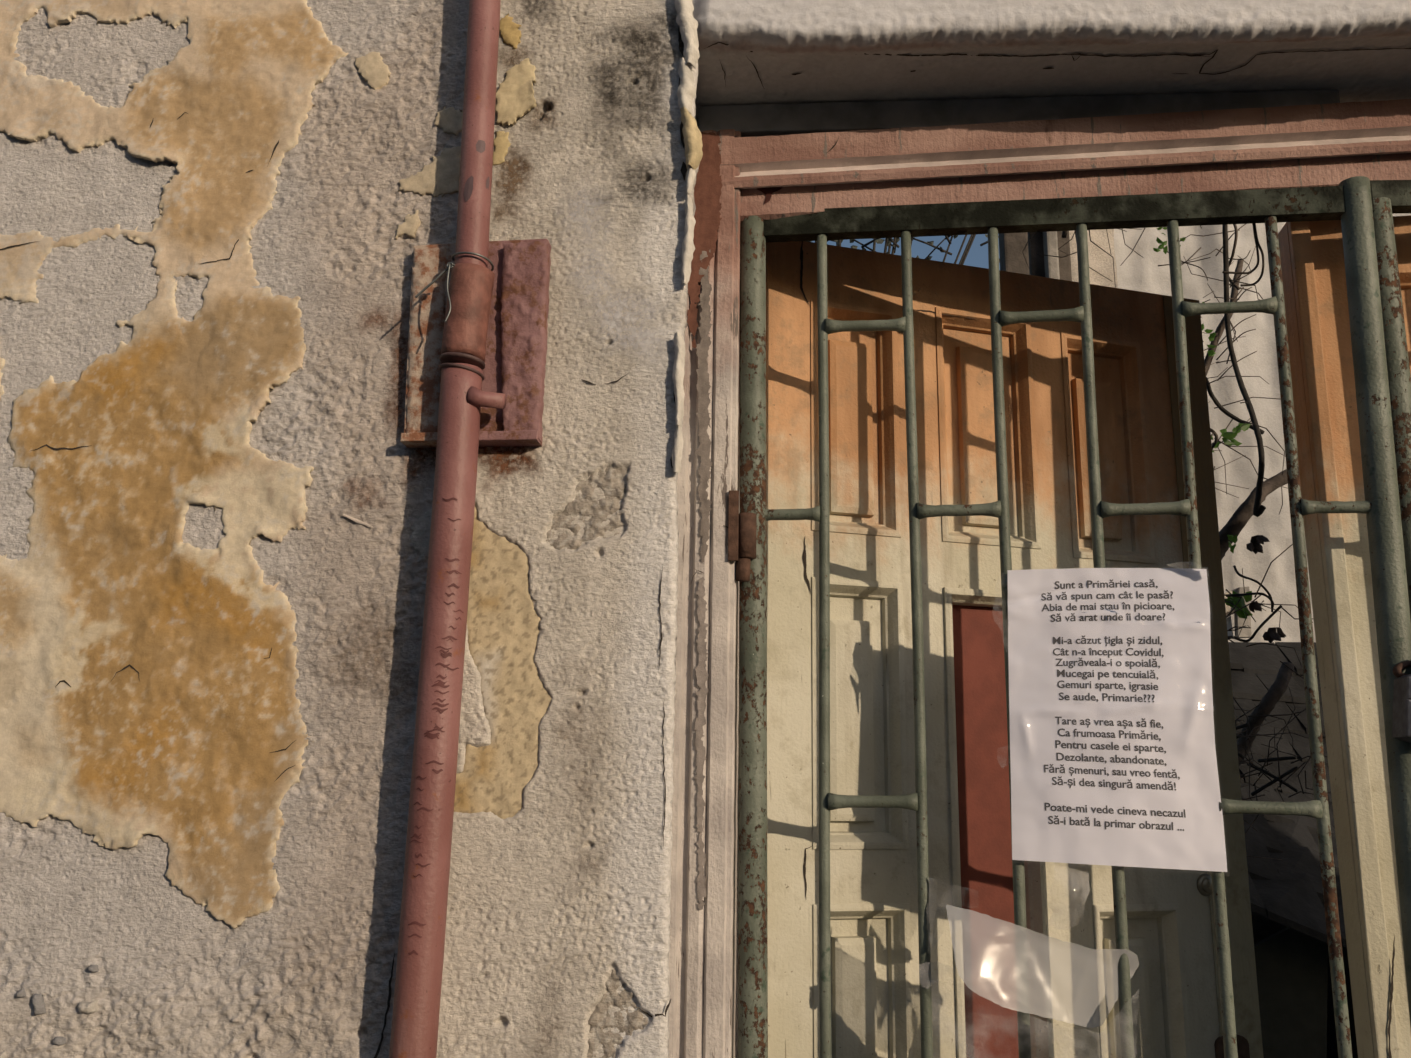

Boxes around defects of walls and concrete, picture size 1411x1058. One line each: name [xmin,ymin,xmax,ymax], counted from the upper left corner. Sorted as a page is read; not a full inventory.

peeling [493,13,537,165]
peeling [395,106,463,240]
peeling [0,0,391,929]
flaking render [454,504,552,819]
crack [374,954,395,1058]
flaking render [587,969,648,1058]